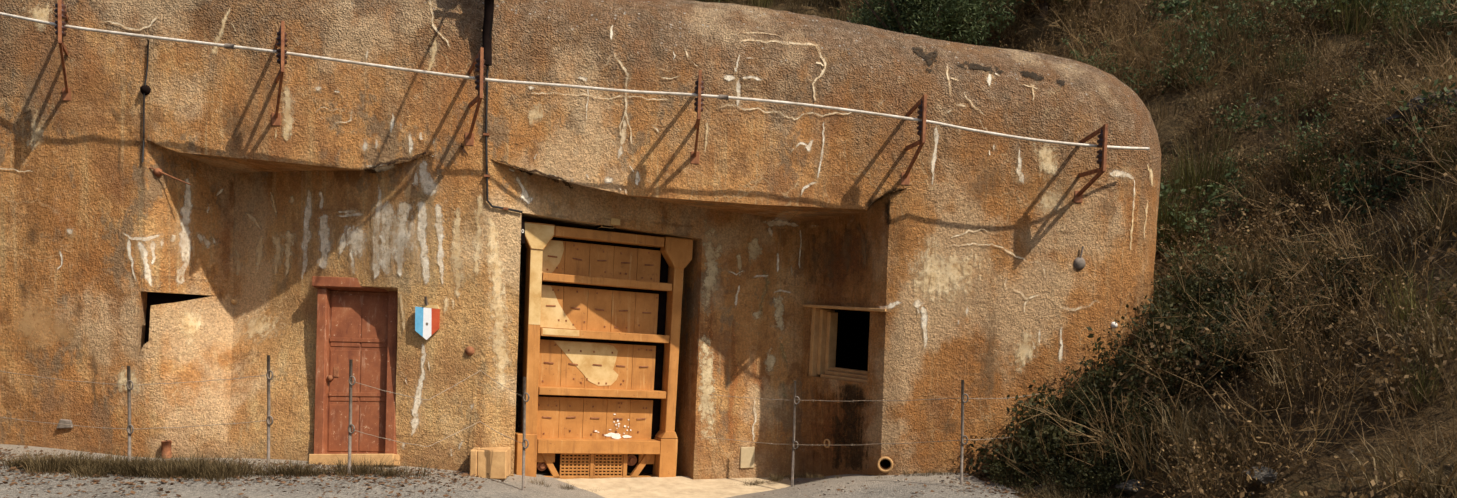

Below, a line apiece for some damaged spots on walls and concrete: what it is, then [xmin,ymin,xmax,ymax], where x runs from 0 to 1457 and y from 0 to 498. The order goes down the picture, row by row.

damp [124,178,223,285]
damp [236,115,510,390]
damp [403,344,430,450]